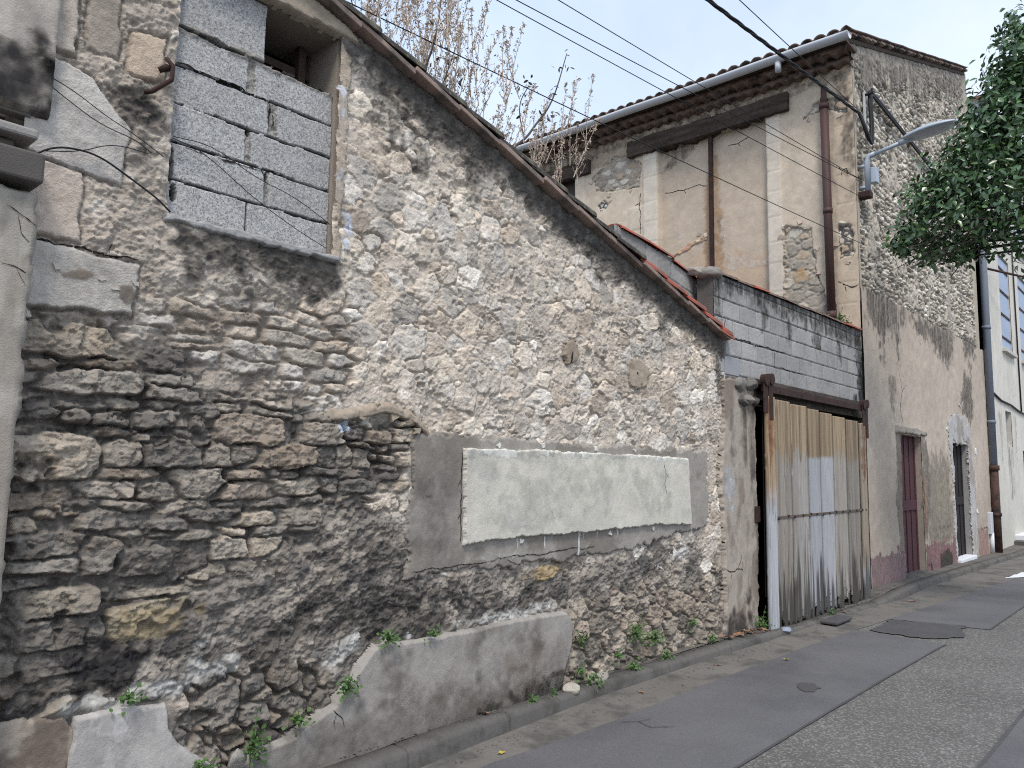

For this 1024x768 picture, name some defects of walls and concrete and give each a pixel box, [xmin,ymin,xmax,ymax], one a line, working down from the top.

crack [6,204,138,260]
spalling [834,221,855,264]
peeling [52,262,139,304]
spalling [778,220,827,314]
water stain [867,258,975,363]
water stain [962,375,973,417]
peeling [478,443,518,458]
peeling [540,443,604,460]
peeling [625,449,689,464]
crack [416,455,594,573]